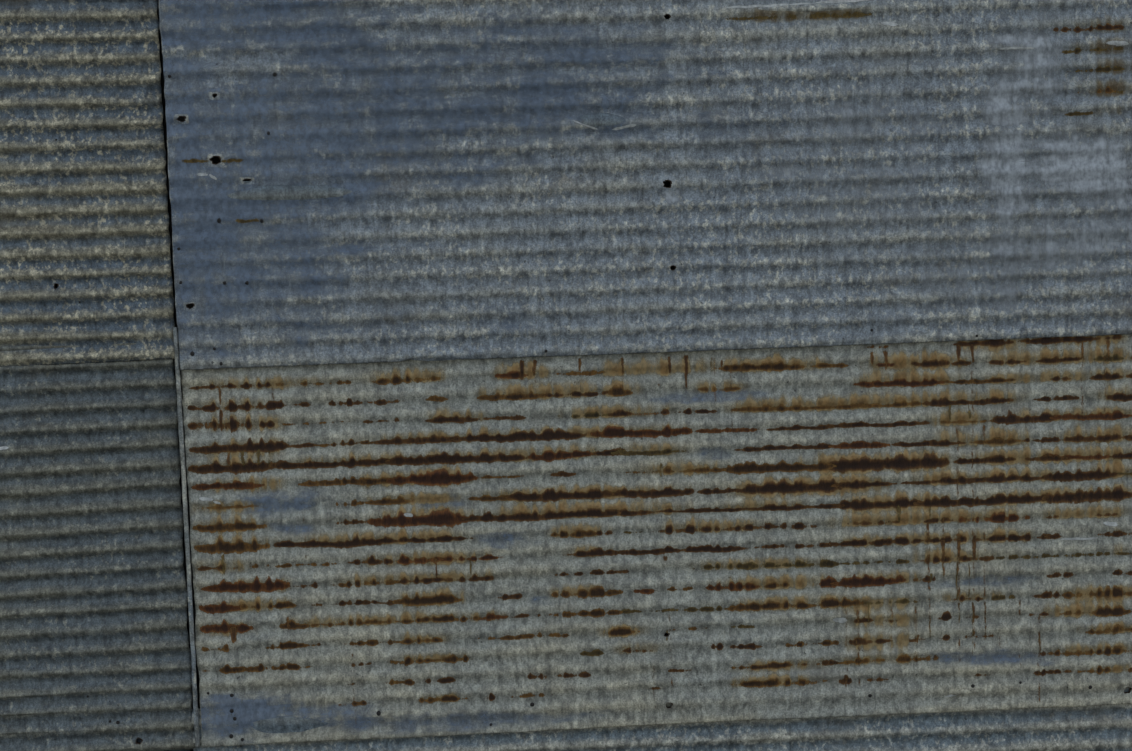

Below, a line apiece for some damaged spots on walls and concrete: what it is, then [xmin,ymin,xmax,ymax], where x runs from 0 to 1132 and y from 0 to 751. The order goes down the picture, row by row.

rust [187,335,1132,704]